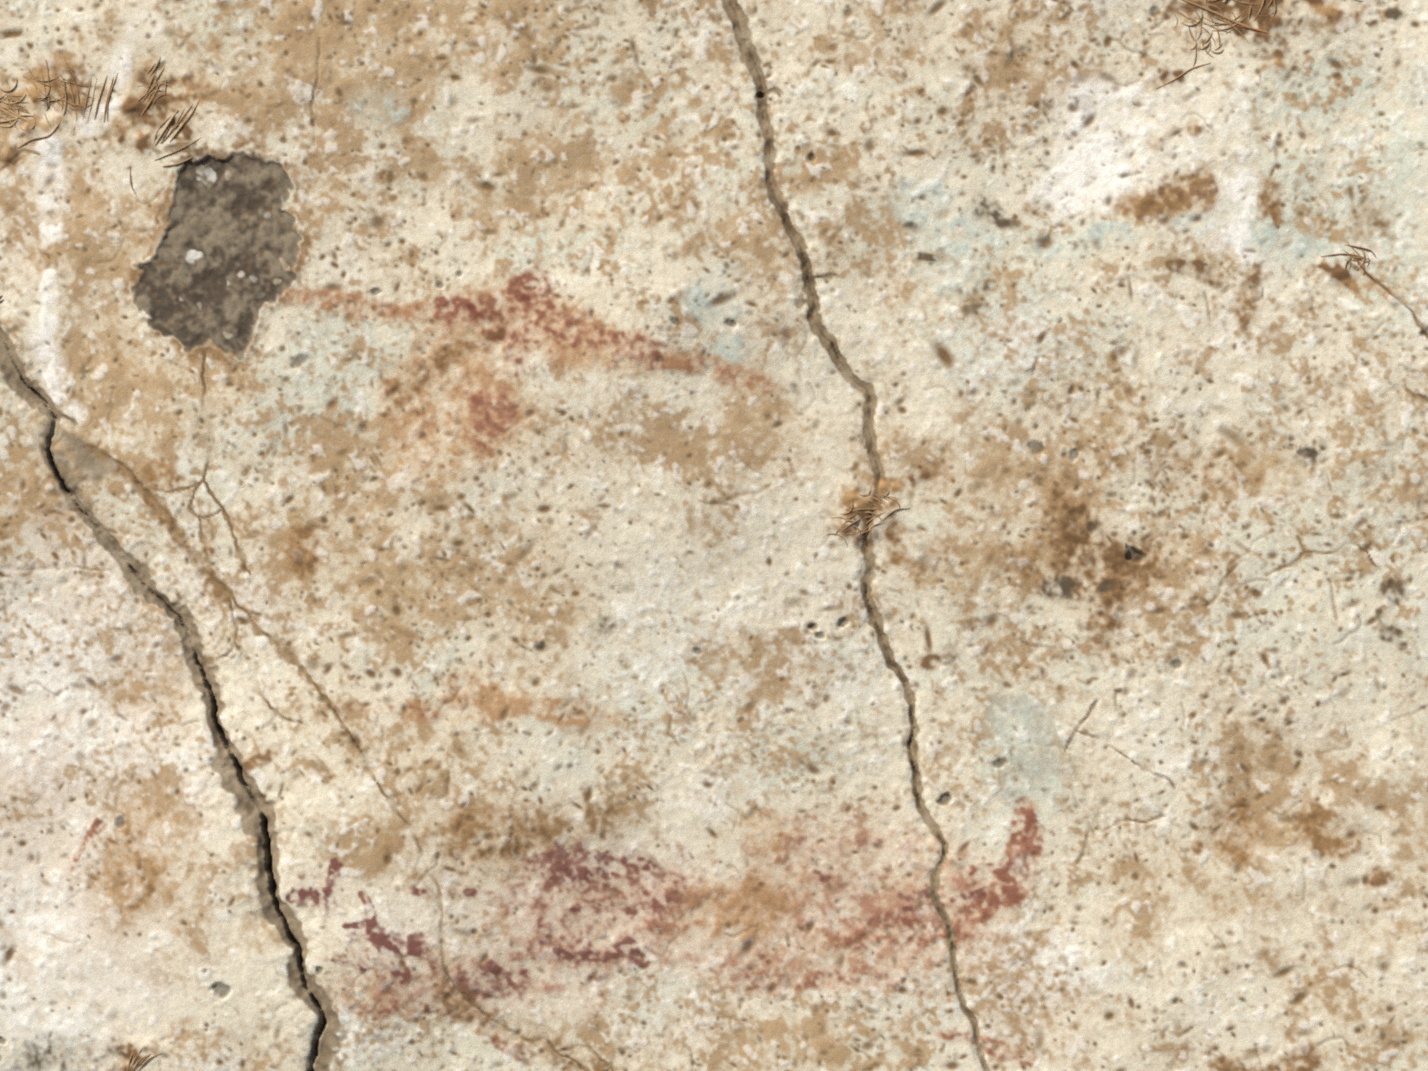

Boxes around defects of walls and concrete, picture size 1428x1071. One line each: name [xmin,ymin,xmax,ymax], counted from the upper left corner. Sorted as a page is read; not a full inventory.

crack [46,209,59,219]
spalling [121,136,316,371]
crack [718,0,886,472]
crack [0,329,643,1071]
crack [858,554,992,1071]